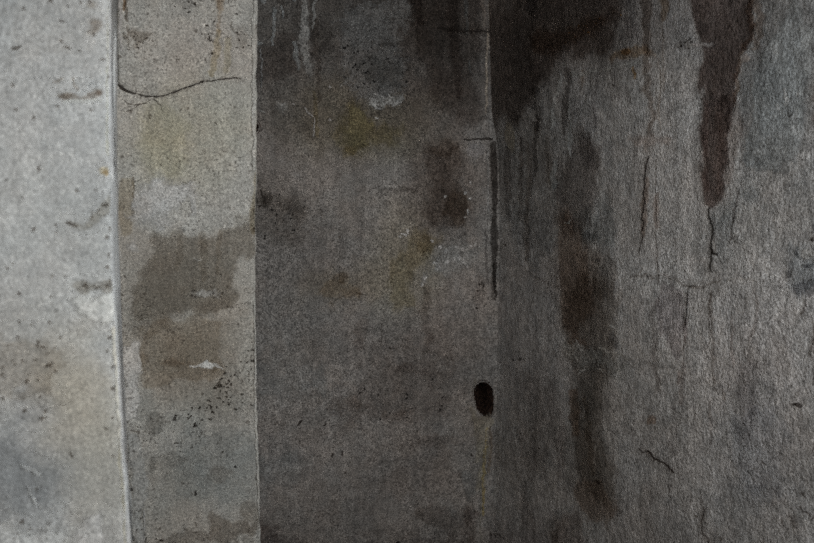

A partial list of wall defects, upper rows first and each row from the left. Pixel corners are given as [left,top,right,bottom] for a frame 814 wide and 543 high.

crack [117,77,242,103]
water stain [744,0,814,174]
water stain [420,240,480,287]
crack [708,207,718,273]
efflorescence [190,360,224,369]